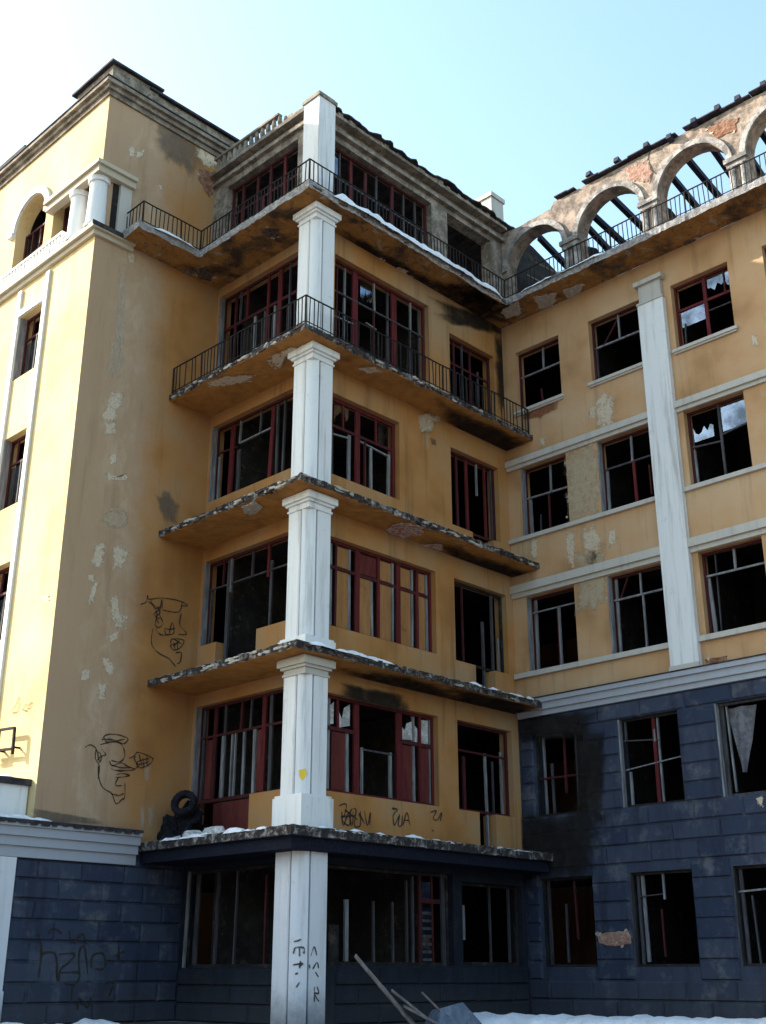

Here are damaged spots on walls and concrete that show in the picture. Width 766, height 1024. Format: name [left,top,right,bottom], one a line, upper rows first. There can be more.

flaking render [705,118,739,139]
flaking render [626,160,653,183]
peeling [171,323,304,399]
peeling [102,390,123,435]
spalling [412,376,504,426]
peeling [588,393,615,428]
water stain [159,493,176,520]
peeling [564,443,618,569]
spalling [386,513,481,551]
peeling [88,543,128,605]
peeling [107,595,128,642]
flaking render [595,929,632,948]